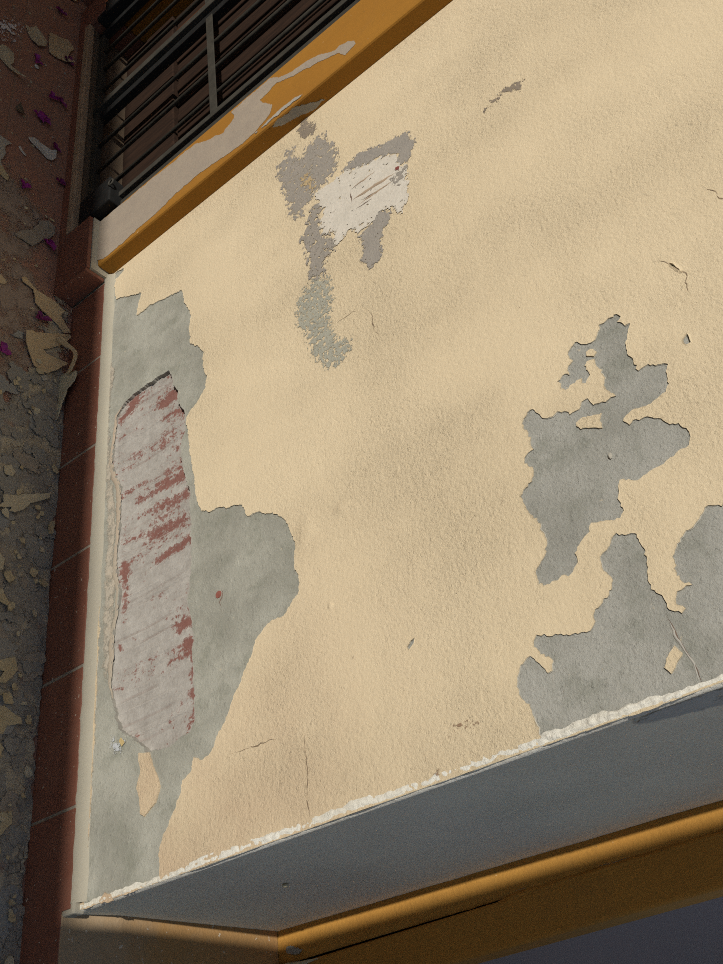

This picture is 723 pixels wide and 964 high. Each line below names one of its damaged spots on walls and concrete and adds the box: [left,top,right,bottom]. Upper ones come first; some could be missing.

peeling [97,41,417,281]
peeling [83,267,300,909]
peeling [516,313,723,746]
crack [295,887,526,962]